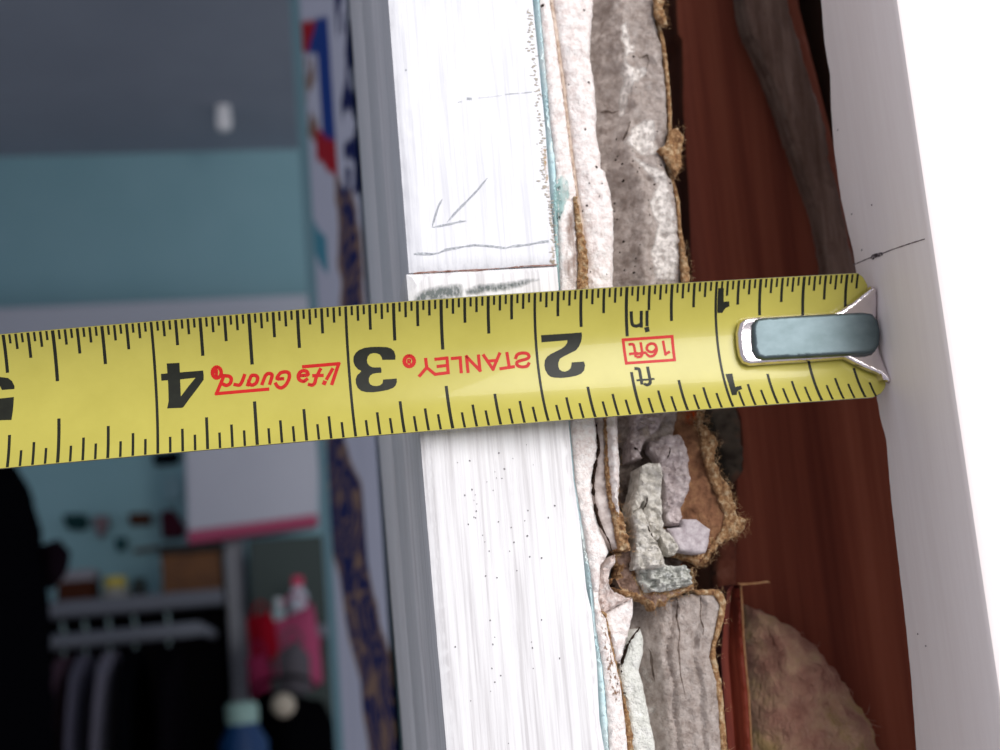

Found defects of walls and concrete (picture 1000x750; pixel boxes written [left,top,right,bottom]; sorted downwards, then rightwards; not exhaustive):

crack [621,627,655,681]
crack [675,596,704,692]